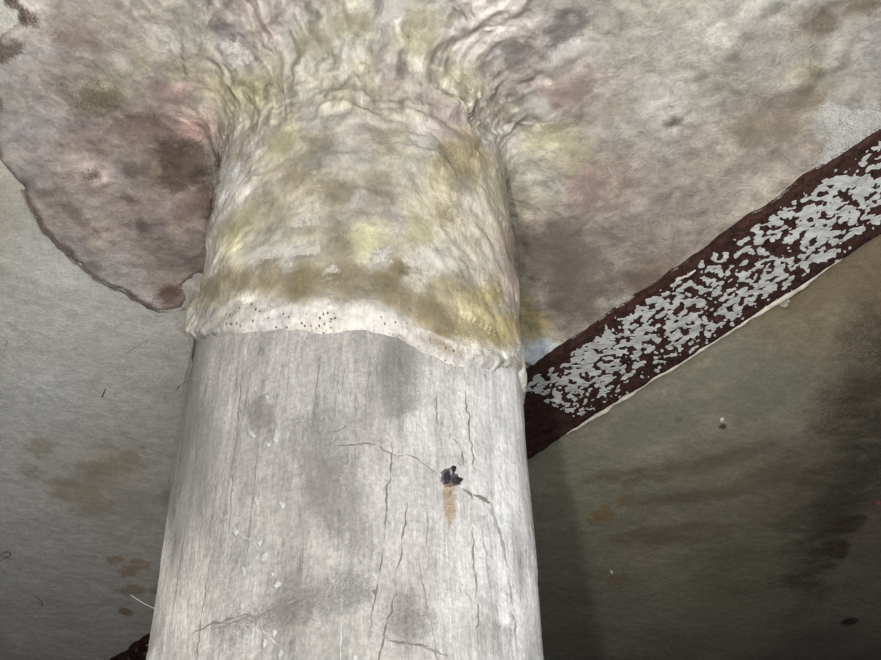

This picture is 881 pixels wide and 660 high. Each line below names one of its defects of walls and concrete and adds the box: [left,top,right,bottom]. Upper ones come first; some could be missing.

leakage [4,0,42,30]
leakage [0,35,25,66]
leakage [54,73,261,242]
leakage [240,212,324,268]
peeling [178,141,881,434]
spalling [243,393,281,448]
rust [442,483,458,524]
crack [334,426,429,660]